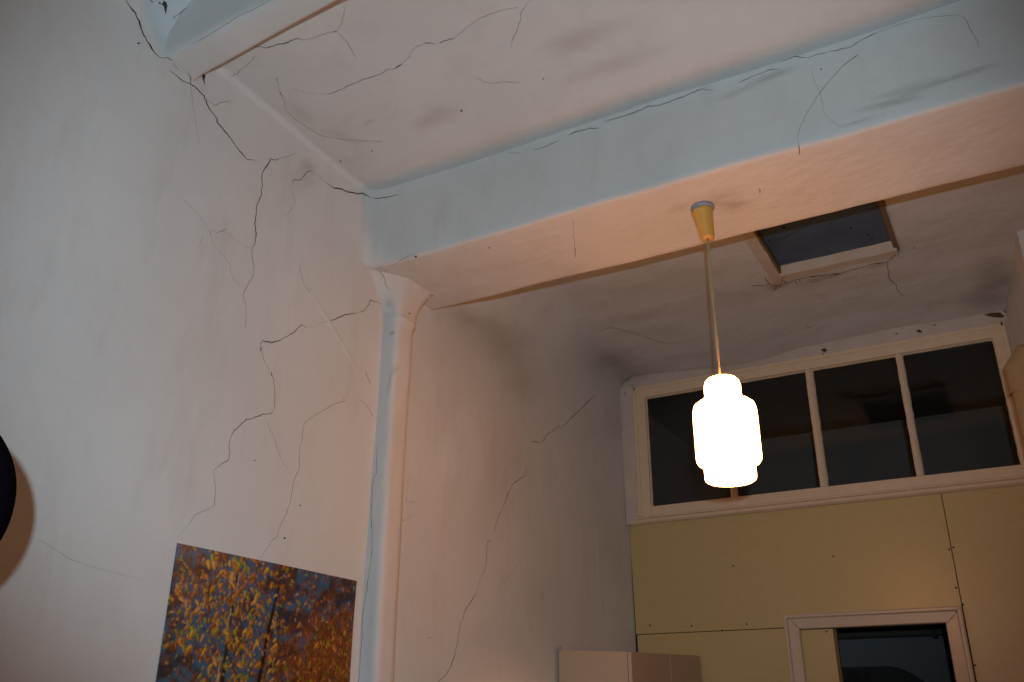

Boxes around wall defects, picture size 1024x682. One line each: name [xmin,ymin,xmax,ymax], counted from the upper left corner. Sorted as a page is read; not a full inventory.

crack [511,88,712,154]
crack [738,15,979,154]
crack [126,0,417,554]